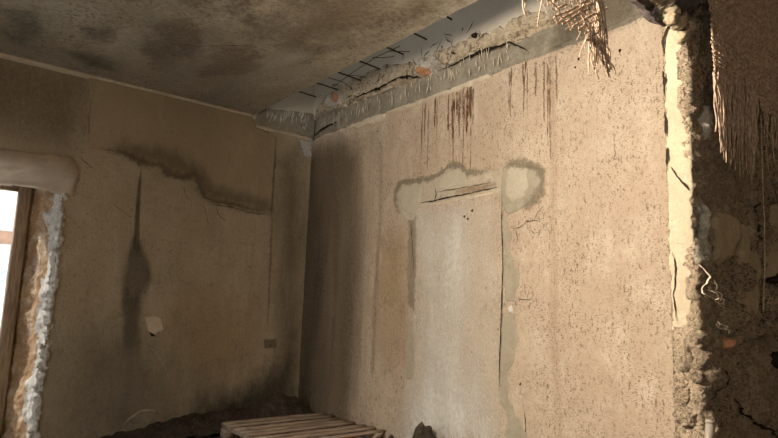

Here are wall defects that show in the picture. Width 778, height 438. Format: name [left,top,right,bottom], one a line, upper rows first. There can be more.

damp [116,147,251,347]
rust [421,97,438,164]
rust [447,86,474,145]
spalling [255,0,710,330]
crack [661,26,690,191]
flaking render [710,195,778,322]